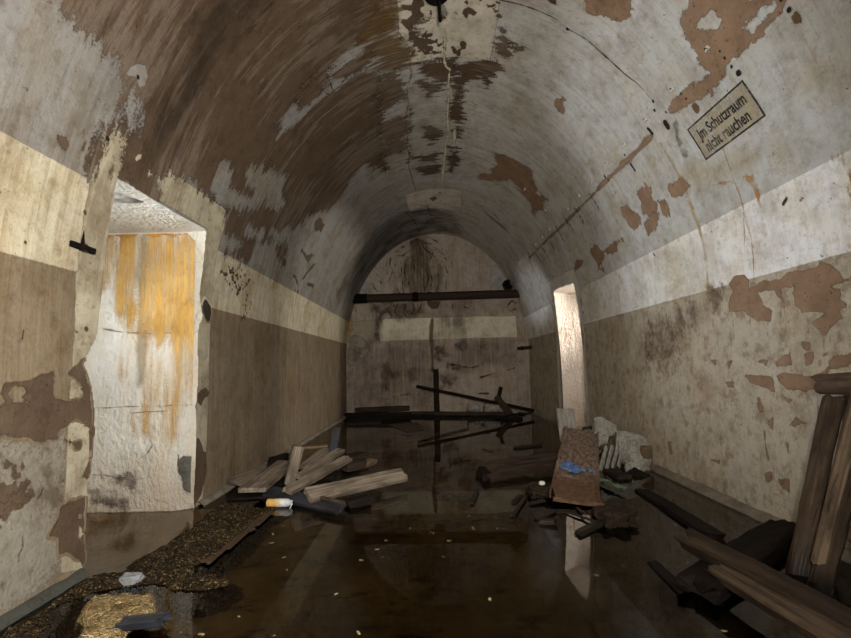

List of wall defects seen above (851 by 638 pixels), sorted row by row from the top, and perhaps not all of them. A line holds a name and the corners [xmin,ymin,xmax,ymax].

peeling [584,0,633,21]
peeling [668,0,786,114]
peeling [47,0,527,267]
peeling [554,96,566,114]
peeling [477,153,549,214]
peeling [621,178,691,236]
corrosion [102,233,195,440]
crack [372,230,467,317]
peeling [590,238,624,272]
spalling [707,258,851,339]
peeling [745,352,851,403]
peeling [0,358,95,616]